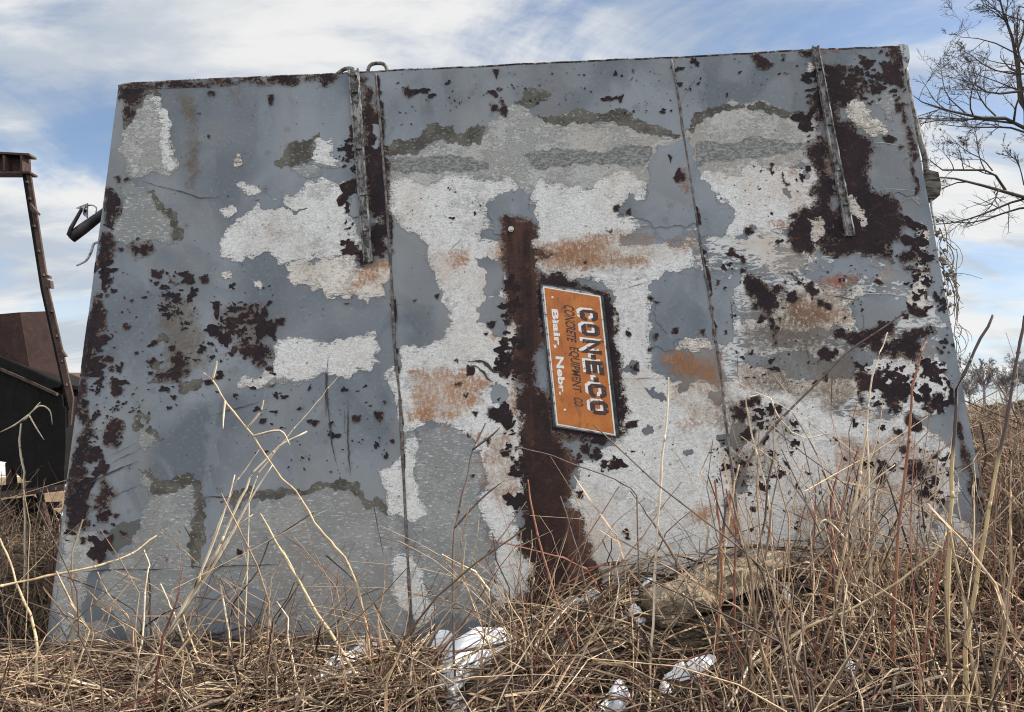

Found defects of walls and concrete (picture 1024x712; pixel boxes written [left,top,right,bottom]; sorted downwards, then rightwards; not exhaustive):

rust [345,75,395,287]
rust [750,54,785,70]
rust [769,46,931,277]
rust [64,278,126,545]
rust [215,305,286,388]
rust [374,215,648,616]
peeling [52,93,987,659]
rust [662,247,955,518]